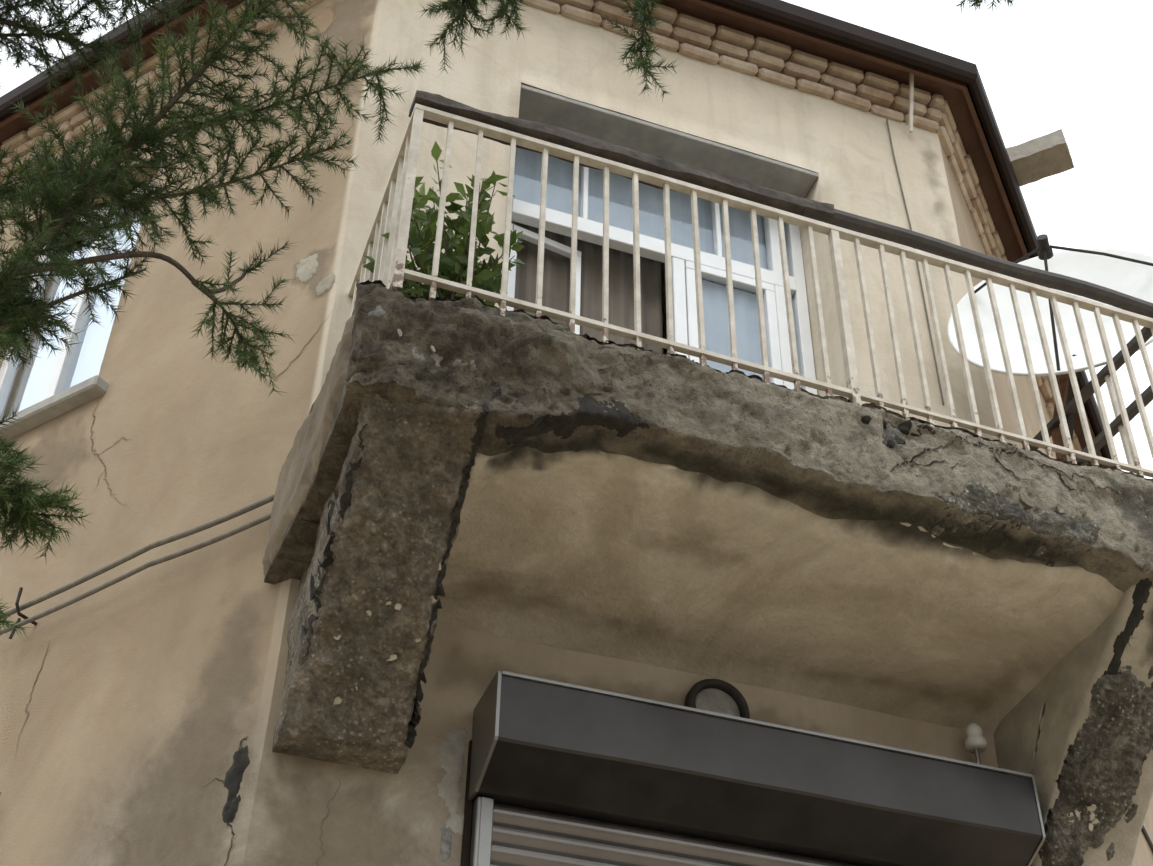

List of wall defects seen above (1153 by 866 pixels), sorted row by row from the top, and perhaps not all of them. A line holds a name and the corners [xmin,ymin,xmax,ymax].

crack [90,401,131,506]
spalling [495,386,649,445]
spalling [861,415,912,450]
crack [882,417,1119,503]
spalling [288,397,483,751]
spalling [1038,578,1153,866]
crack [200,736,250,866]